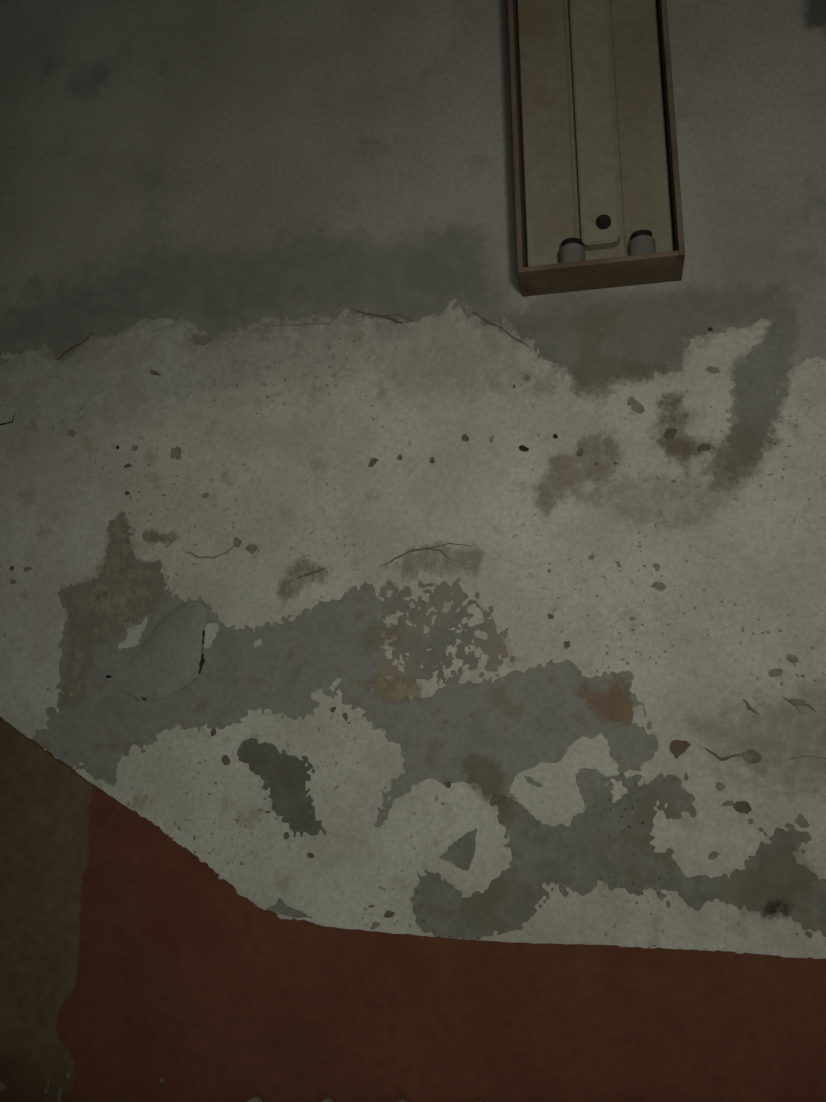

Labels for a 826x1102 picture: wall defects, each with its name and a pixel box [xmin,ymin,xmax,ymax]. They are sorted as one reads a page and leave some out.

leakage [657,319,795,486]
peeling [0,299,826,959]
crack [385,543,470,565]